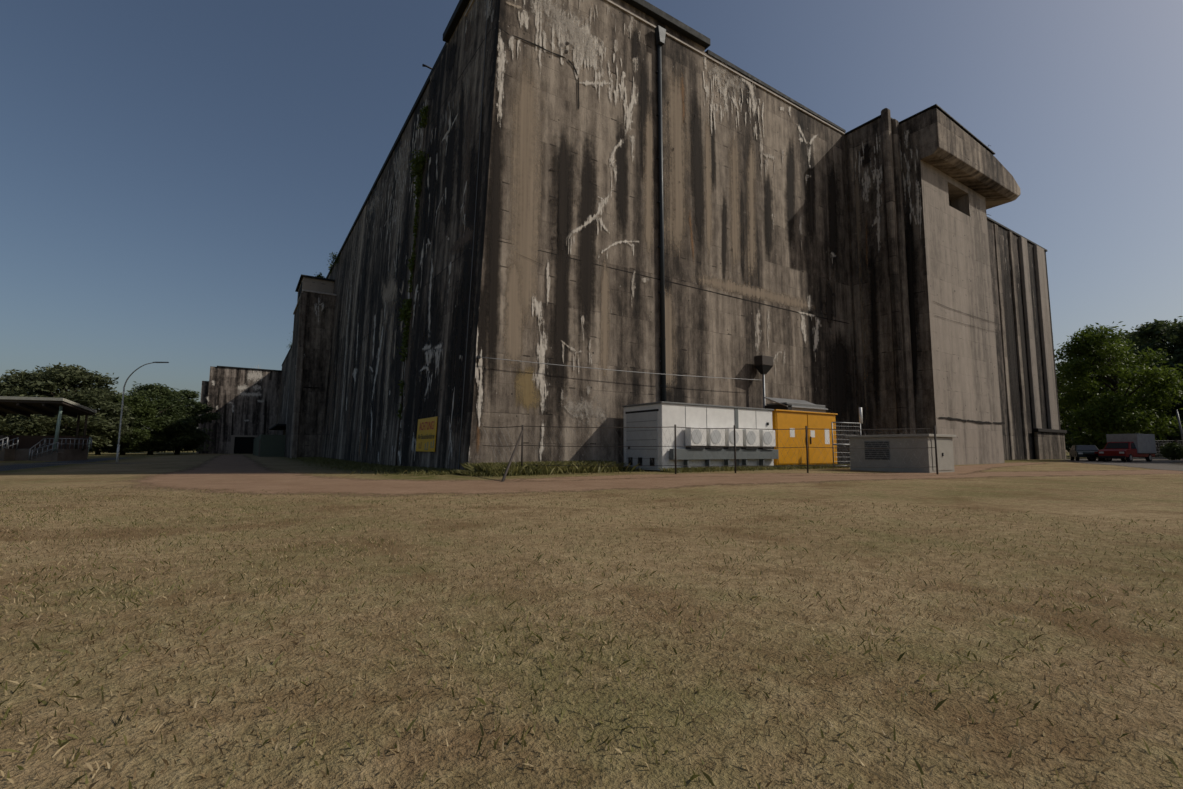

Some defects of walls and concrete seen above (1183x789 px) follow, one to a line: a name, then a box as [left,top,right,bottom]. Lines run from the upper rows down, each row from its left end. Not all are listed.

crack [513,35,579,110]
leakage [315,0,882,465]
leakage [900,130,922,394]
leakage [996,256,1059,427]